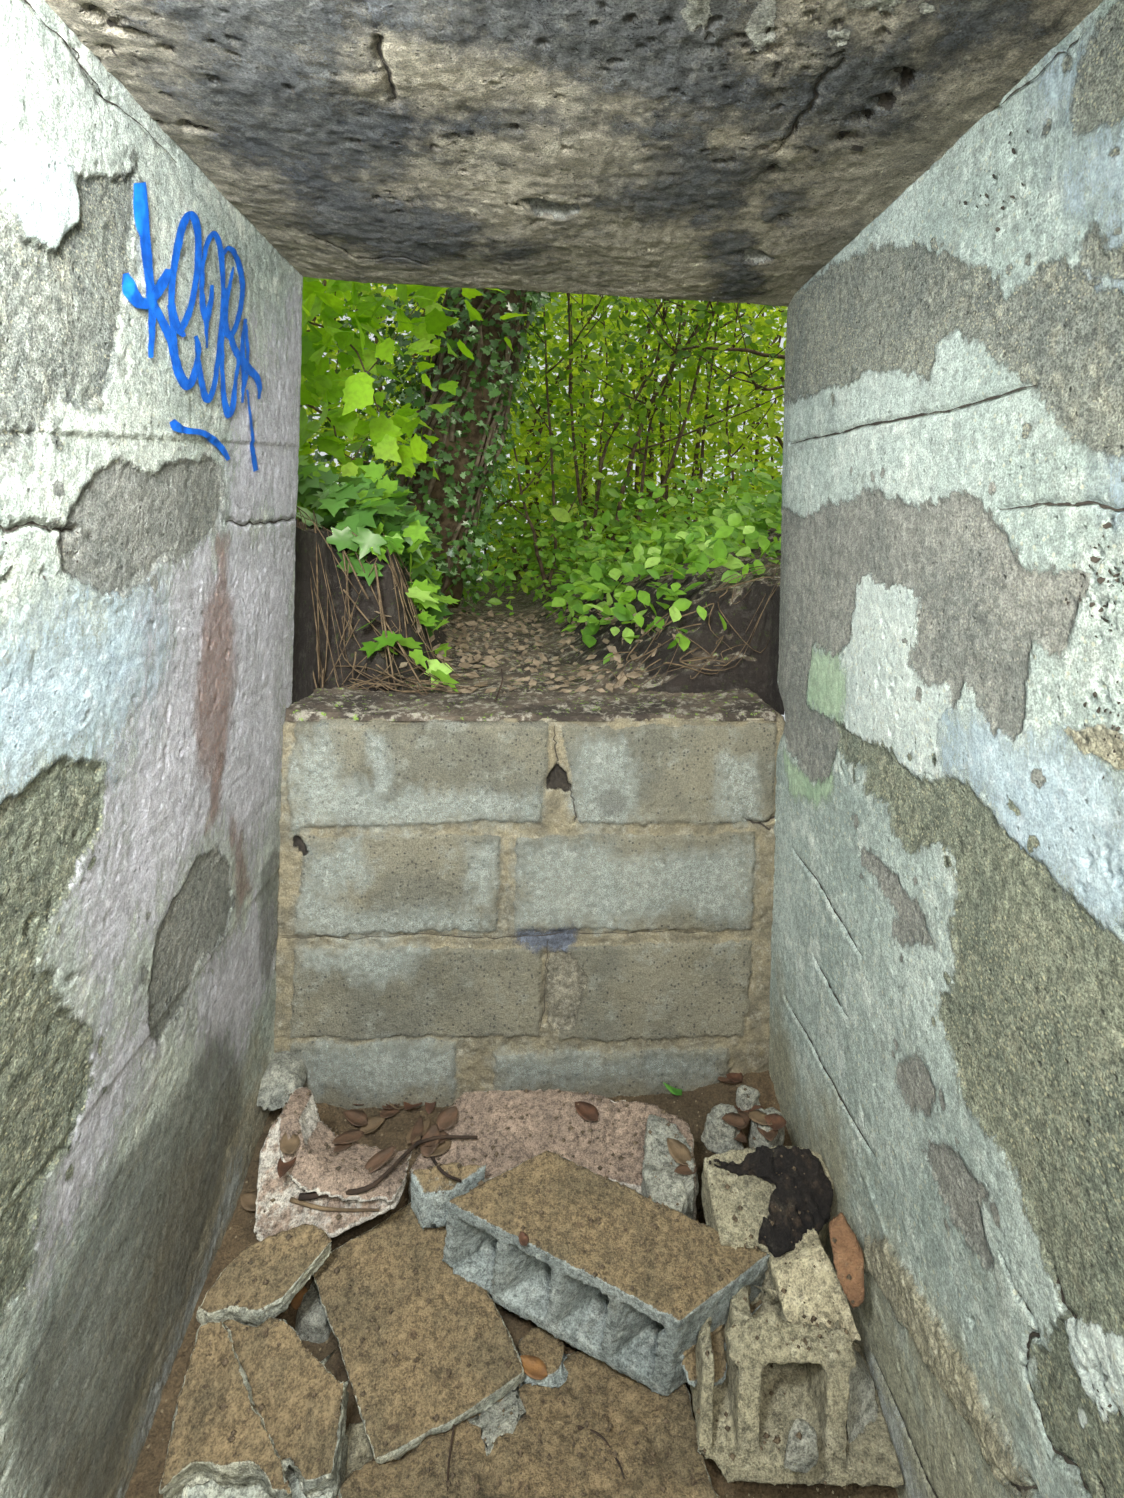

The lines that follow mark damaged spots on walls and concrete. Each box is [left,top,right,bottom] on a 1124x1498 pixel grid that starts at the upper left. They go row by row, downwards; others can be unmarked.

leakage [147,0,1062,301]
leakage [1041,50,1083,110]
leakage [1064,127,1124,249]
crack [0,521,73,532]
spalling [0,140,141,485]
crack [225,518,291,526]
crack [792,385,1036,444]
spalling [784,222,1124,457]
crack [999,501,1124,511]
corrosion [198,542,231,818]
spalling [0,752,108,1325]
spalling [777,467,1124,1498]